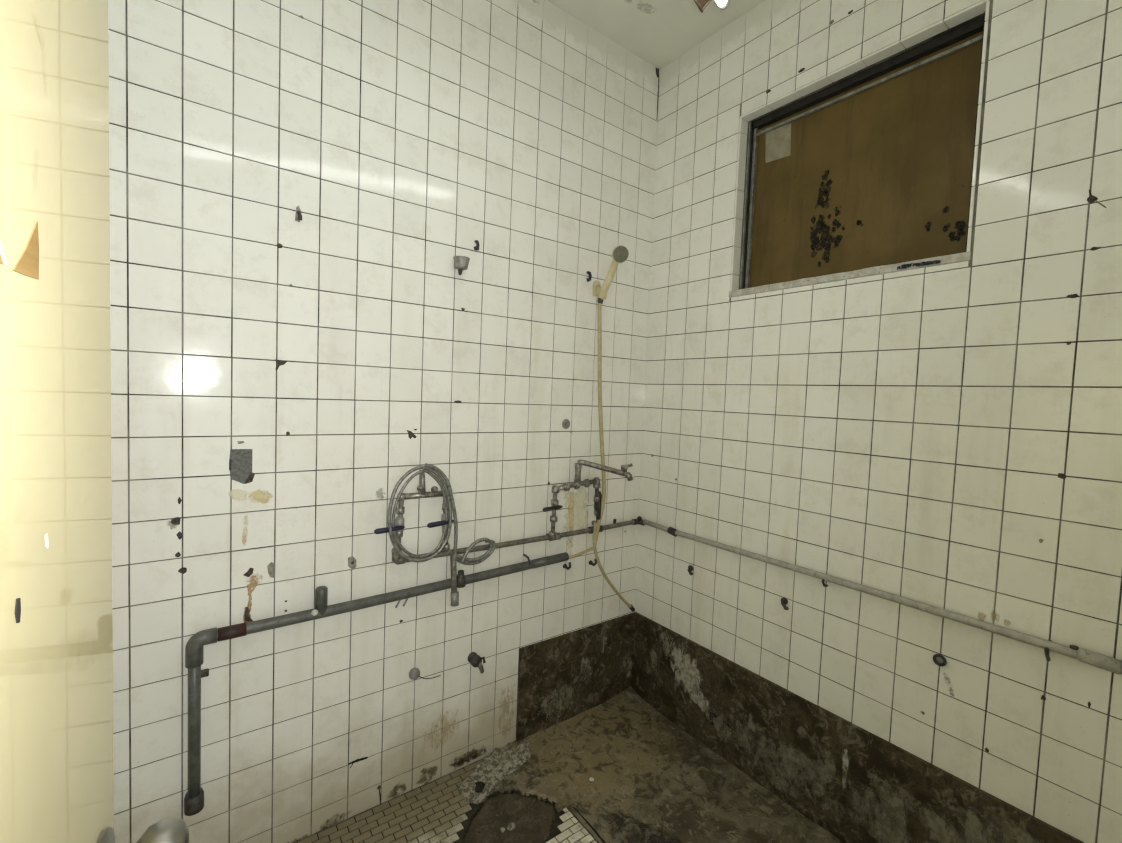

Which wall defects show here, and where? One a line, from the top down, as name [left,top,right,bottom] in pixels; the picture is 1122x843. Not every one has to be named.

peeling [13,222,39,280]
spalling [229,441,255,484]
rust [243,568,258,623]
water stain [540,656,593,719]
water stain [649,630,1050,843]
water stain [602,808,682,843]